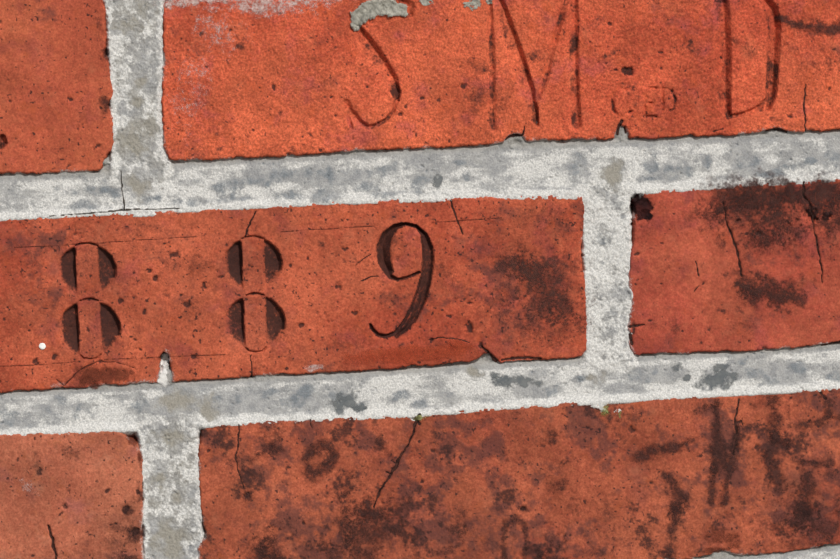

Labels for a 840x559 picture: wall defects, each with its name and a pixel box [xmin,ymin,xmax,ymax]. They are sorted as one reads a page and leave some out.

spalling [630,193,654,221]
crack [723,202,742,277]
crack [802,181,823,283]
water stain [495,256,572,323]
crack [373,413,422,508]
water stain [634,438,695,461]
water stain [673,364,740,506]
water stain [763,395,833,536]
crack [47,525,57,559]
water stain [501,506,549,559]
water stain [661,472,690,559]